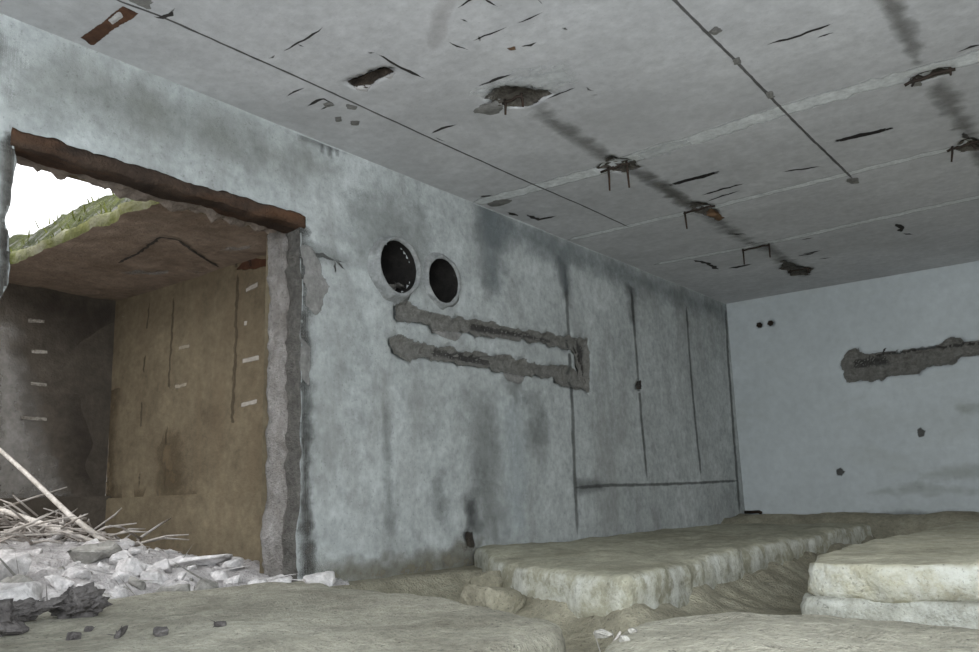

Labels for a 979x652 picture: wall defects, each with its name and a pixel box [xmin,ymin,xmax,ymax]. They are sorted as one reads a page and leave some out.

peeling [130,0,152,9]
spalling [348,67,395,91]
spalling [474,67,573,115]
spalling [308,98,360,126]
spalling [956,133,979,152]
spalling [596,142,688,172]